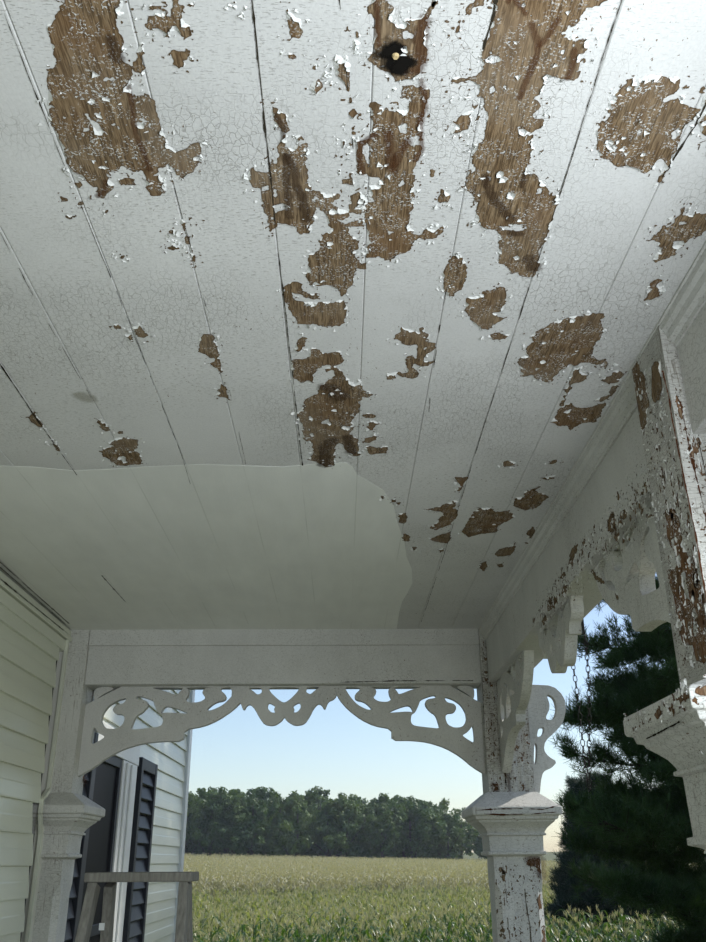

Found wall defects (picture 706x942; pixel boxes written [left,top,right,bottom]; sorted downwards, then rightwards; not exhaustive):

peeling [36,0,211,222]
peeling [586,73,706,188]
peeling [159,214,205,268]
peeling [243,0,607,469]
peeling [636,199,706,306]
peeling [93,418,147,468]
peeling [379,494,420,552]
peeling [423,459,564,553]
peeling [476,526,537,571]
peeling [514,310,706,734]
peeling [481,639,534,792]
peeling [495,857,546,942]